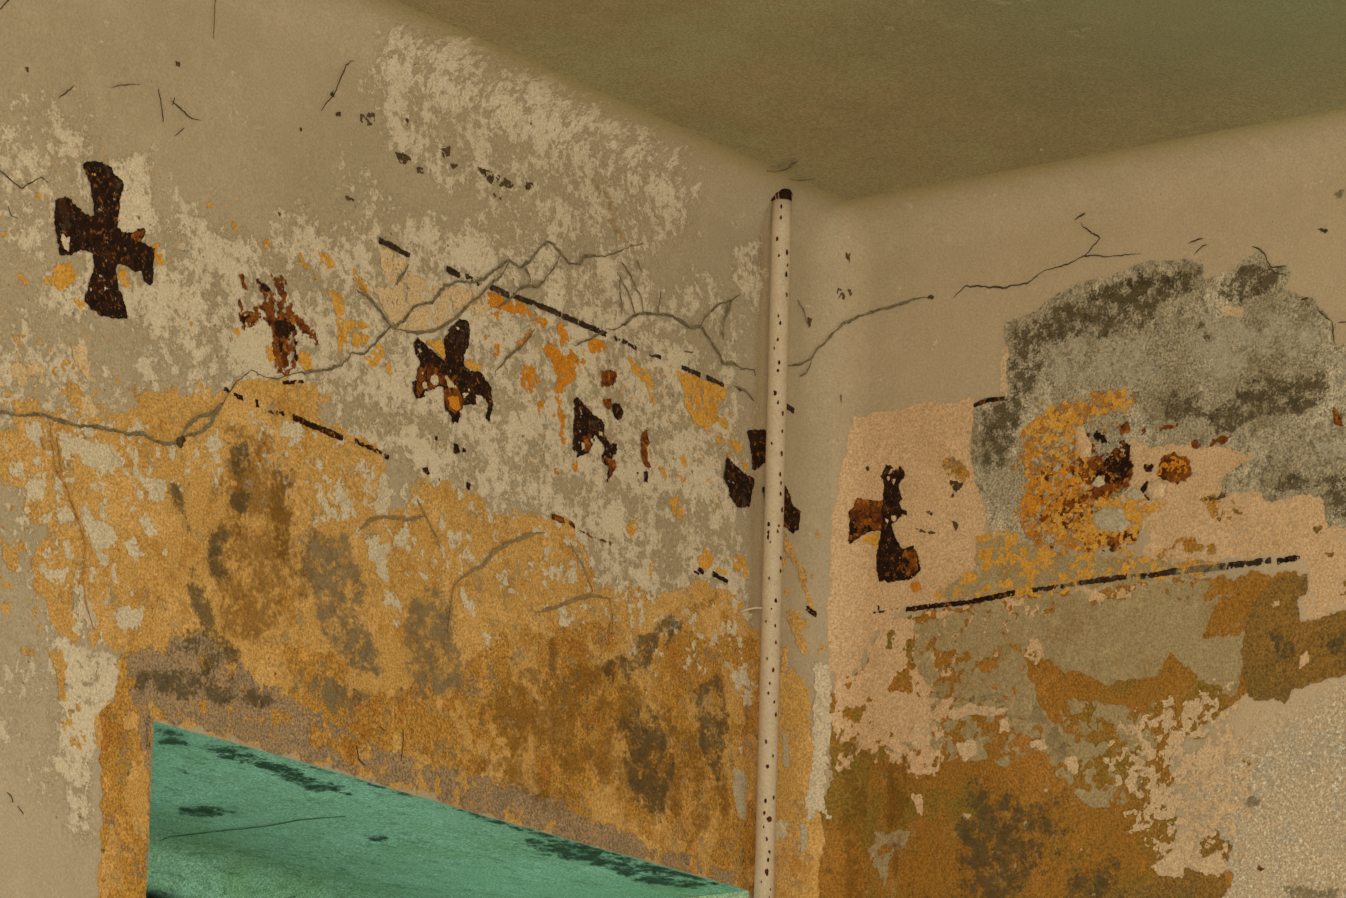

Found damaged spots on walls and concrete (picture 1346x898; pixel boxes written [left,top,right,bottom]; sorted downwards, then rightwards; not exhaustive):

crack [0,241,756,641]
rust [416,365,462,414]
peeling [353,248,606,475]
crack [788,213,1140,376]
water stain [981,267,1203,474]
rust [1012,388,1178,562]
rust [1157,434,1231,484]
water stain [1159,370,1330,435]
peeling [0,304,761,898]
peeling [774,251,1346,898]
water stain [205,745,412,796]
water stain [457,809,718,889]